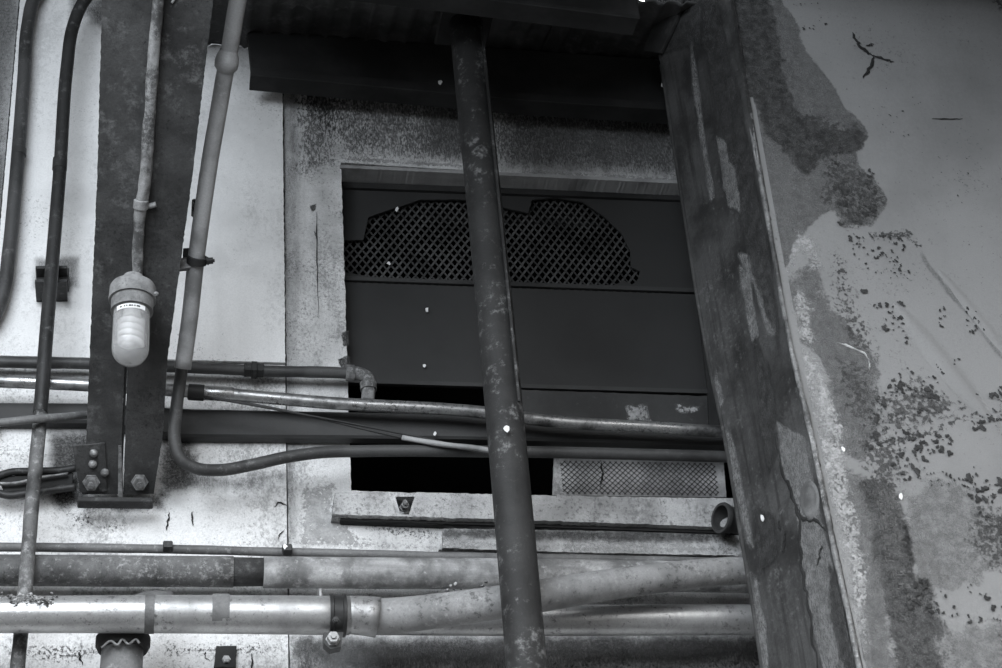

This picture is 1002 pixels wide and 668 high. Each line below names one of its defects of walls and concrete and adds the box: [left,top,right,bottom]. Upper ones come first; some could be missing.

water stain [297,96,336,167]
peeling [691,45,740,211]
peeling [772,152,821,271]
peeling [739,253,777,341]
peeling [776,287,867,668]
peeling [899,479,1002,590]
peeling [934,622,1002,668]